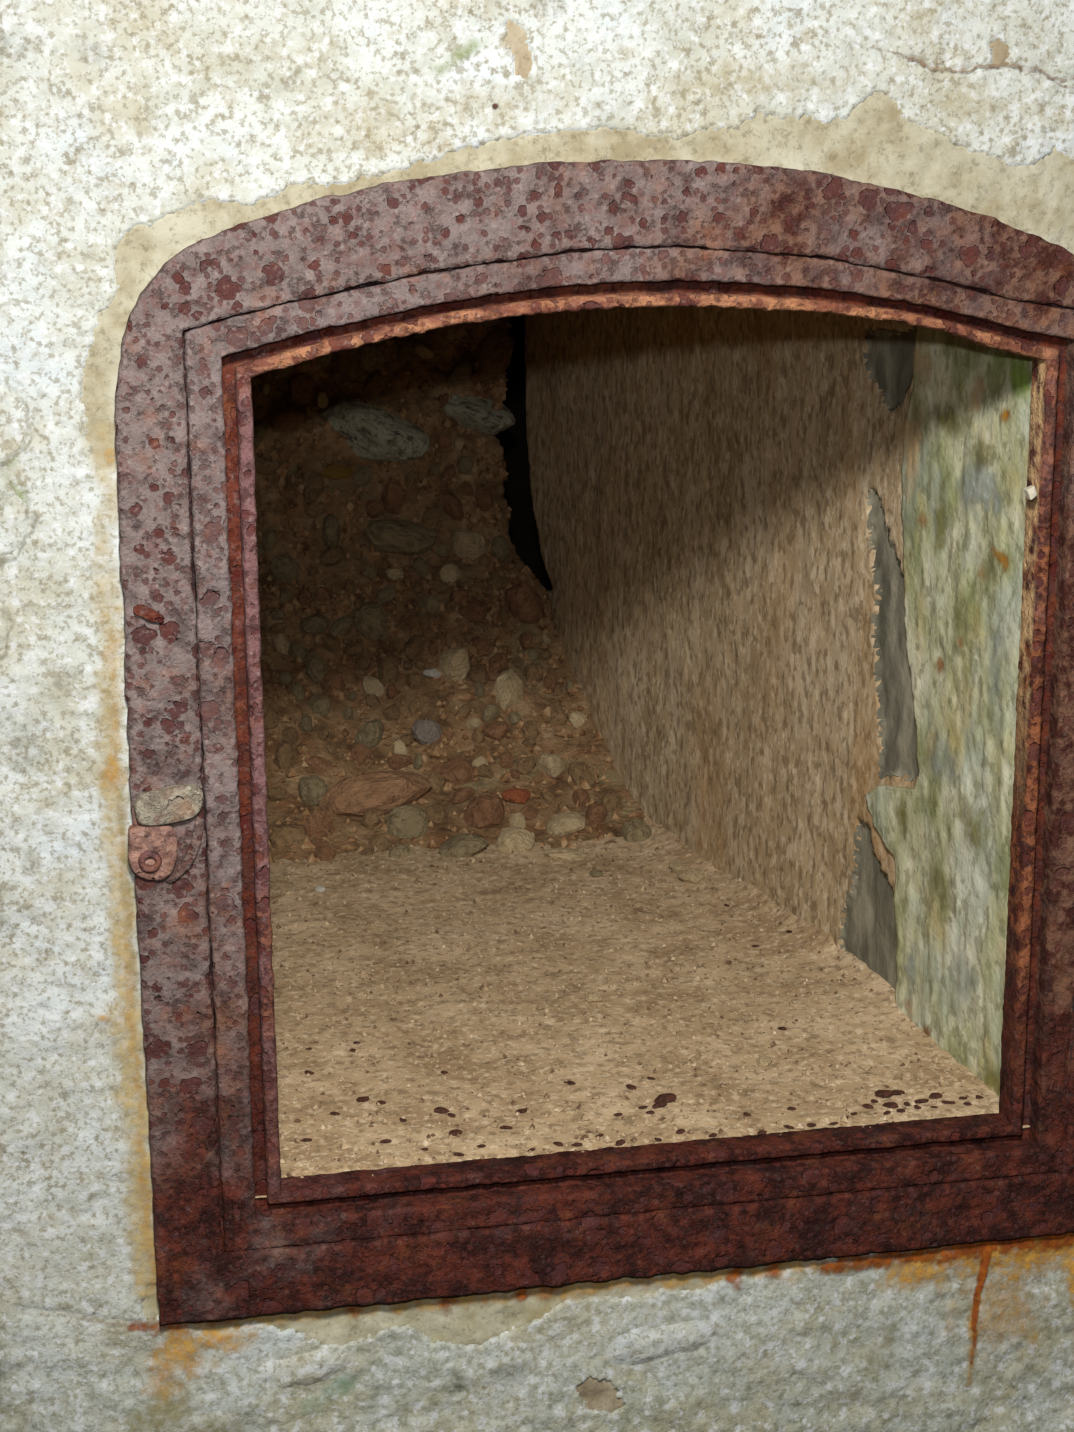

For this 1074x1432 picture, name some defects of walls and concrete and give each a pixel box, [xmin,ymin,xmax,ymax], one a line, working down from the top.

crack [897,52,1067,87]
rust [101,831,156,1297]
rust [395,1232,1074,1366]